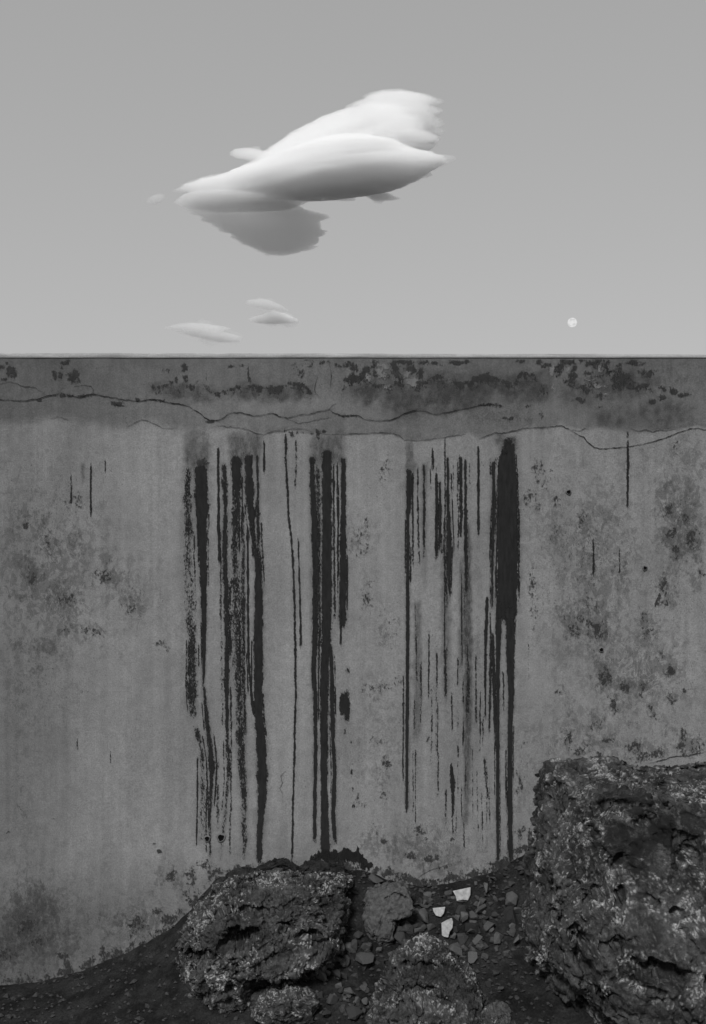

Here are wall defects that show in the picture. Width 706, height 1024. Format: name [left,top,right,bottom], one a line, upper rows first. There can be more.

water stain [0,362,17,381]
water stain [51,359,80,383]
water stain [151,363,312,400]
water stain [427,359,548,419]
water stain [649,385,691,404]
crack [0,382,706,449]
water stain [564,601,608,639]
water stain [284,429,560,887]
water stain [3,436,269,985]
water stain [564,665,663,763]
water stain [677,728,705,757]